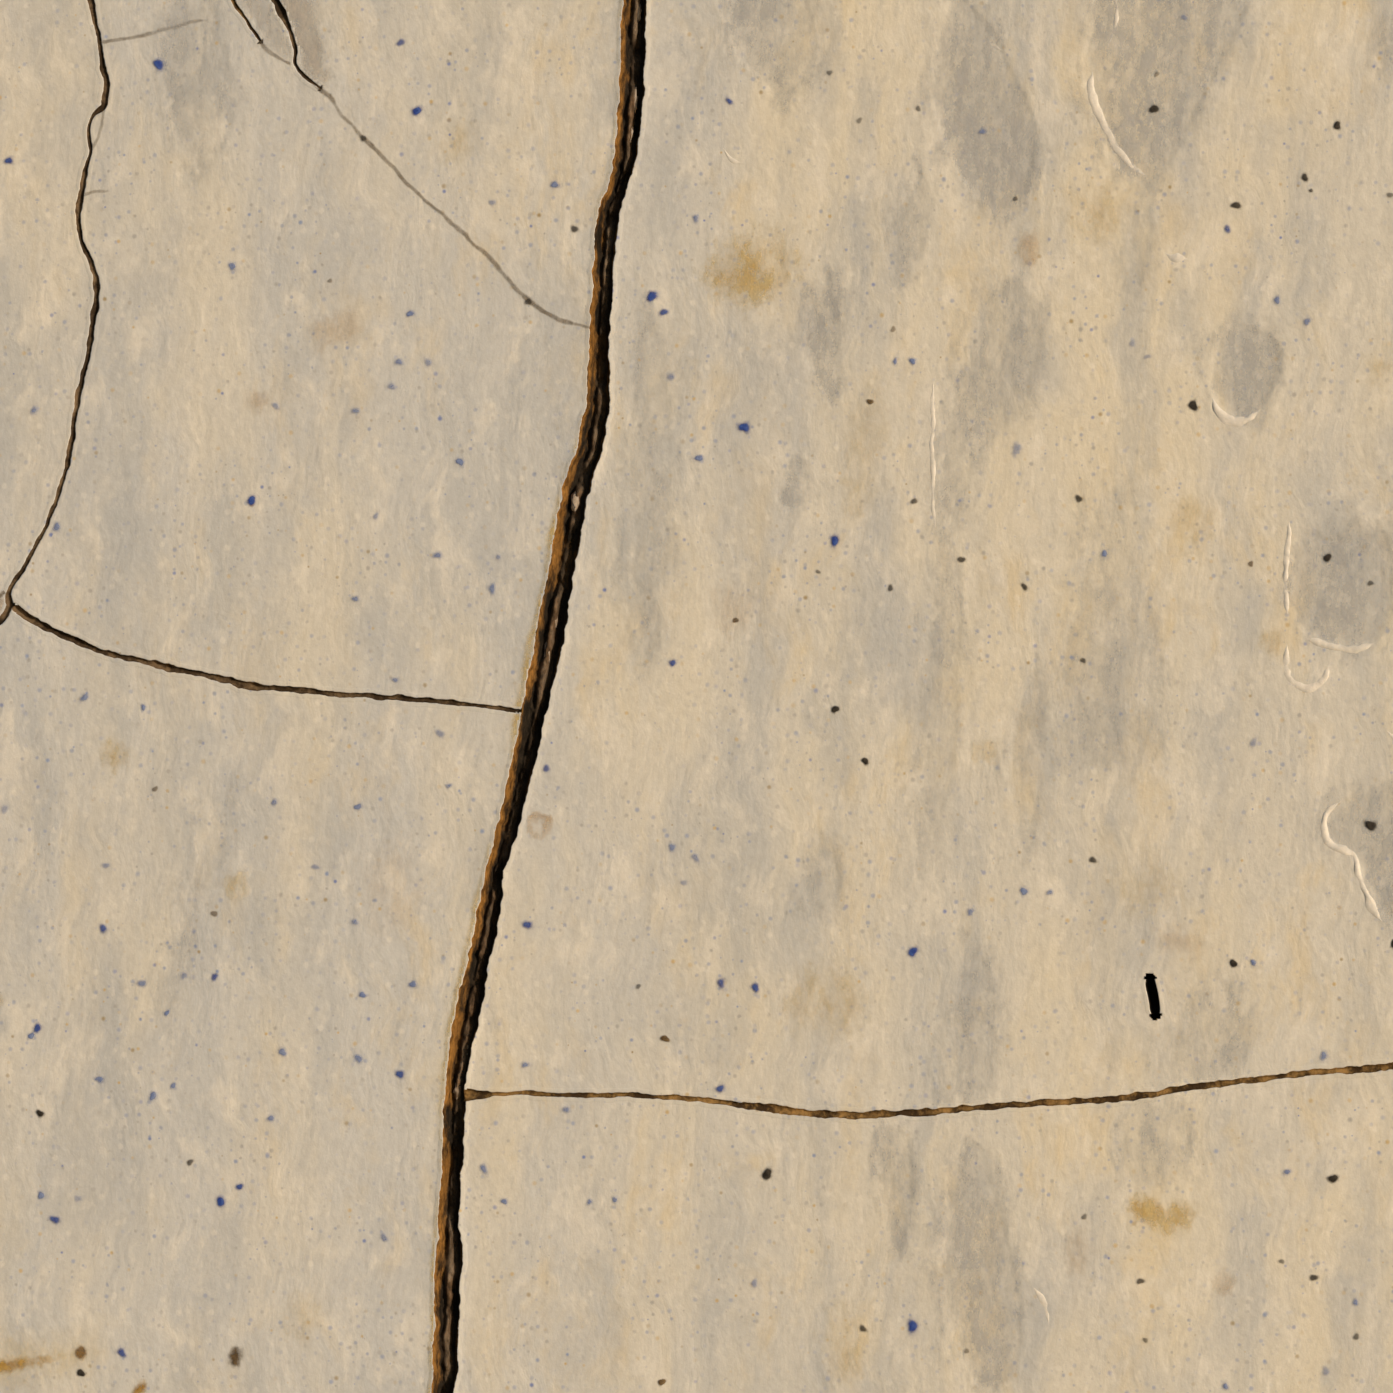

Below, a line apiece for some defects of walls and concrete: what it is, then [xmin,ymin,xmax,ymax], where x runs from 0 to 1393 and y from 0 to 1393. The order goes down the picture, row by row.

crack [0,0,522,716]
crack [427,0,1393,1393]
corrosion [0,1359,25,1371]